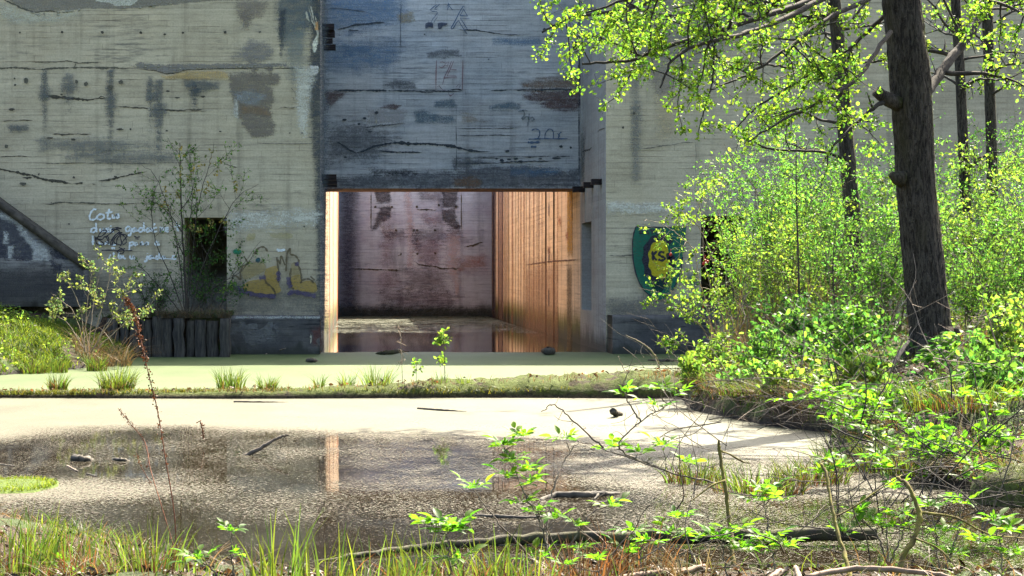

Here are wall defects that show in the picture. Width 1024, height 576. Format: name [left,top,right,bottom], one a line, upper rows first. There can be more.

damp [0,0,585,344]